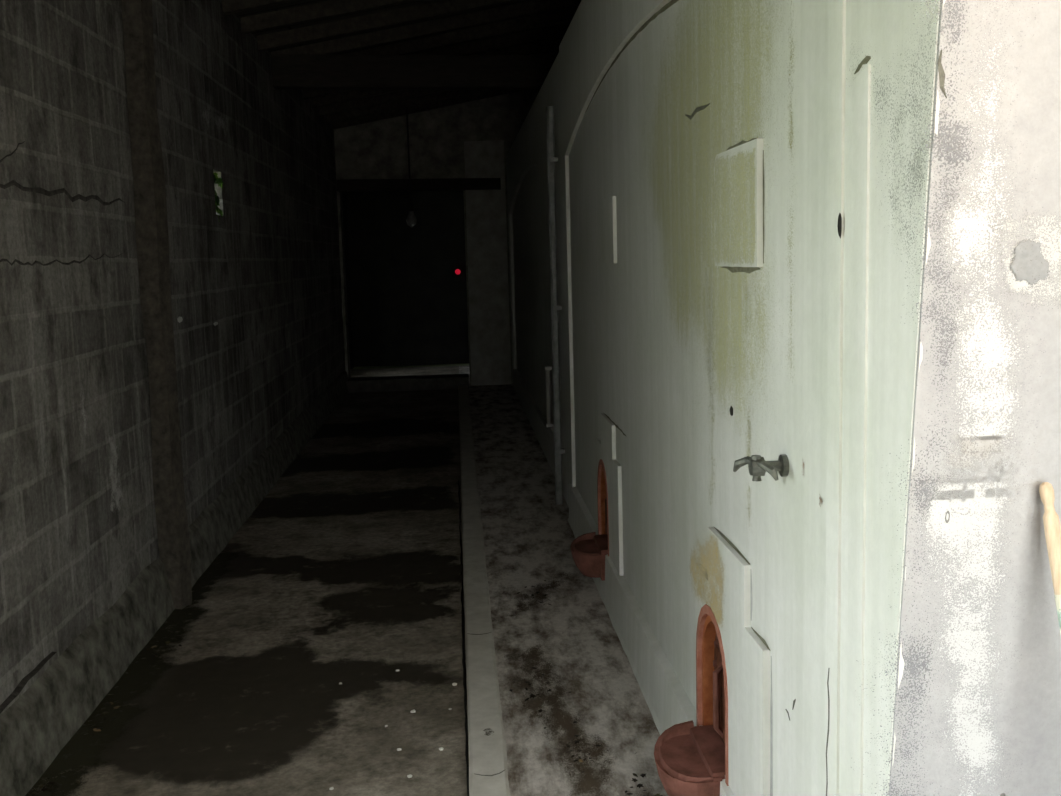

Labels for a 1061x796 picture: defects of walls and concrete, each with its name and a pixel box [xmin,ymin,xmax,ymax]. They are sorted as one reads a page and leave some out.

crack [0,141,125,206]
water stain [249,485,462,519]
crack [0,652,56,714]
water stain [61,542,465,793]